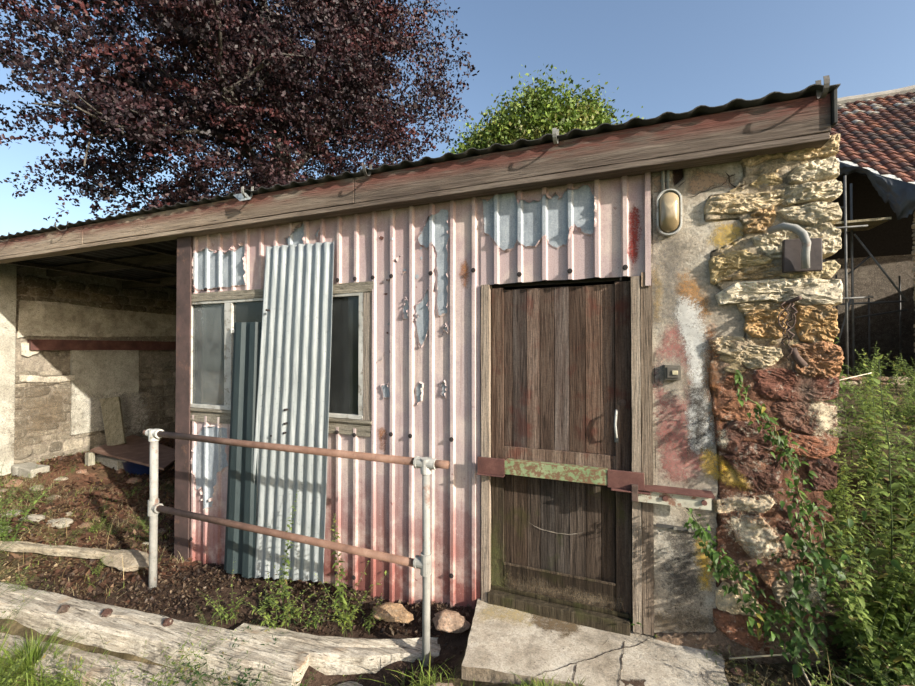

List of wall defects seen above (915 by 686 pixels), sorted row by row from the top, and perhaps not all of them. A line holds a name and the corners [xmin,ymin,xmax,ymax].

peeling [480,182,597,253]
peeling [192,242,247,291]
peeling [402,208,450,348]
peeling [191,424,229,510]
crack [535,637,652,686]